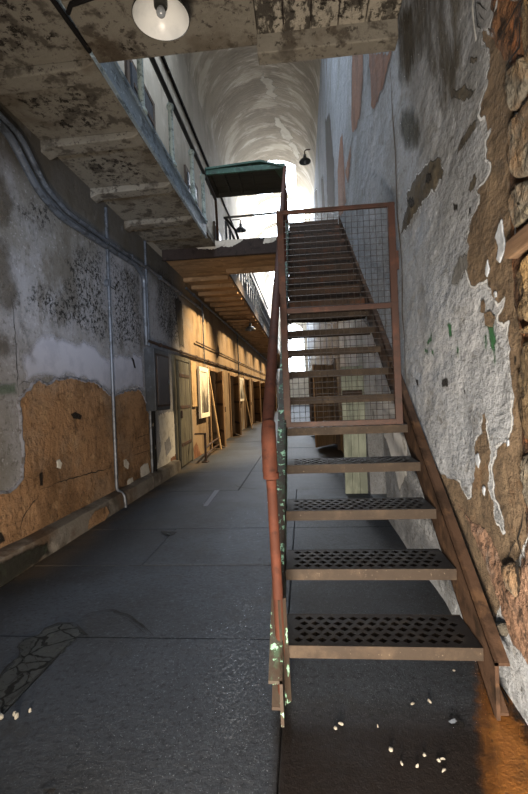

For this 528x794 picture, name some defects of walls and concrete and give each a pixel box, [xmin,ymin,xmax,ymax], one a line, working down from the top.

flaking render [351,51,392,132]
damp [0,179,12,221]
flaking render [338,136,351,216]
damp [0,248,17,308]
damp [31,248,141,345]
flaking render [435,0,528,664]
flaking render [0,376,176,548]